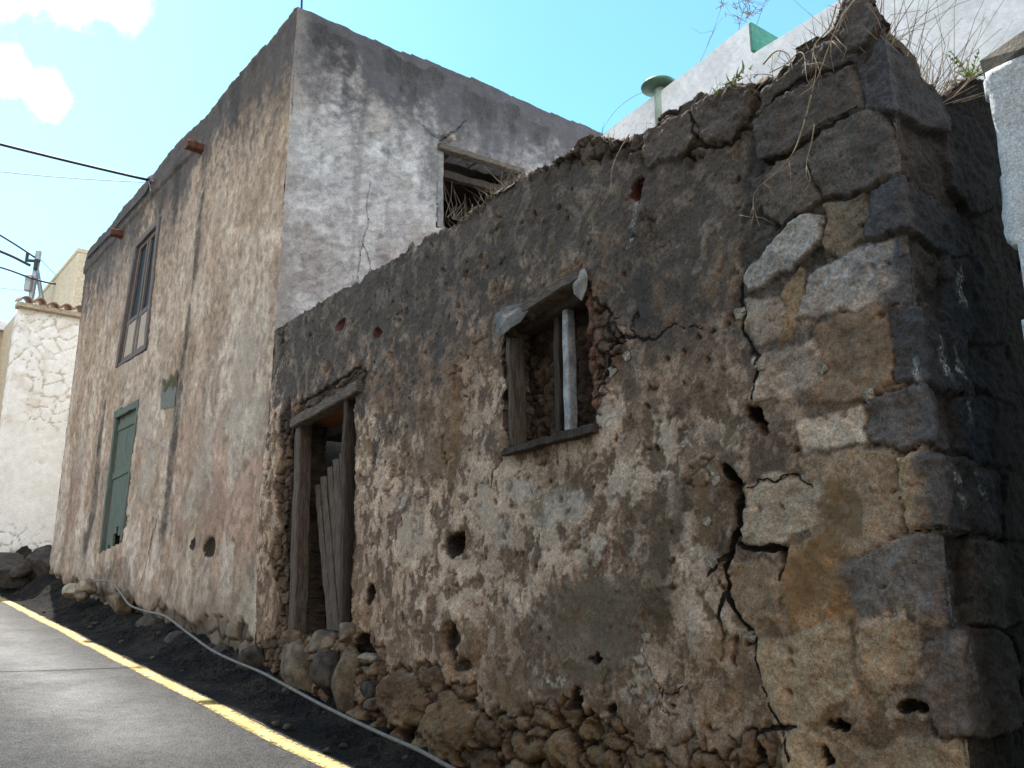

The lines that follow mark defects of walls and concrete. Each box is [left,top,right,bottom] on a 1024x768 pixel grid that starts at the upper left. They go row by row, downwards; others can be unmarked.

water stain [192,193,204,289]
crack [357,185,371,280]
crack [594,296,703,406]
crack [734,267,765,400]
water stain [159,305,191,537]
peeling [471,475,608,562]
hole [447,625,473,671]
peeling [618,647,650,704]
crack [706,463,813,768]